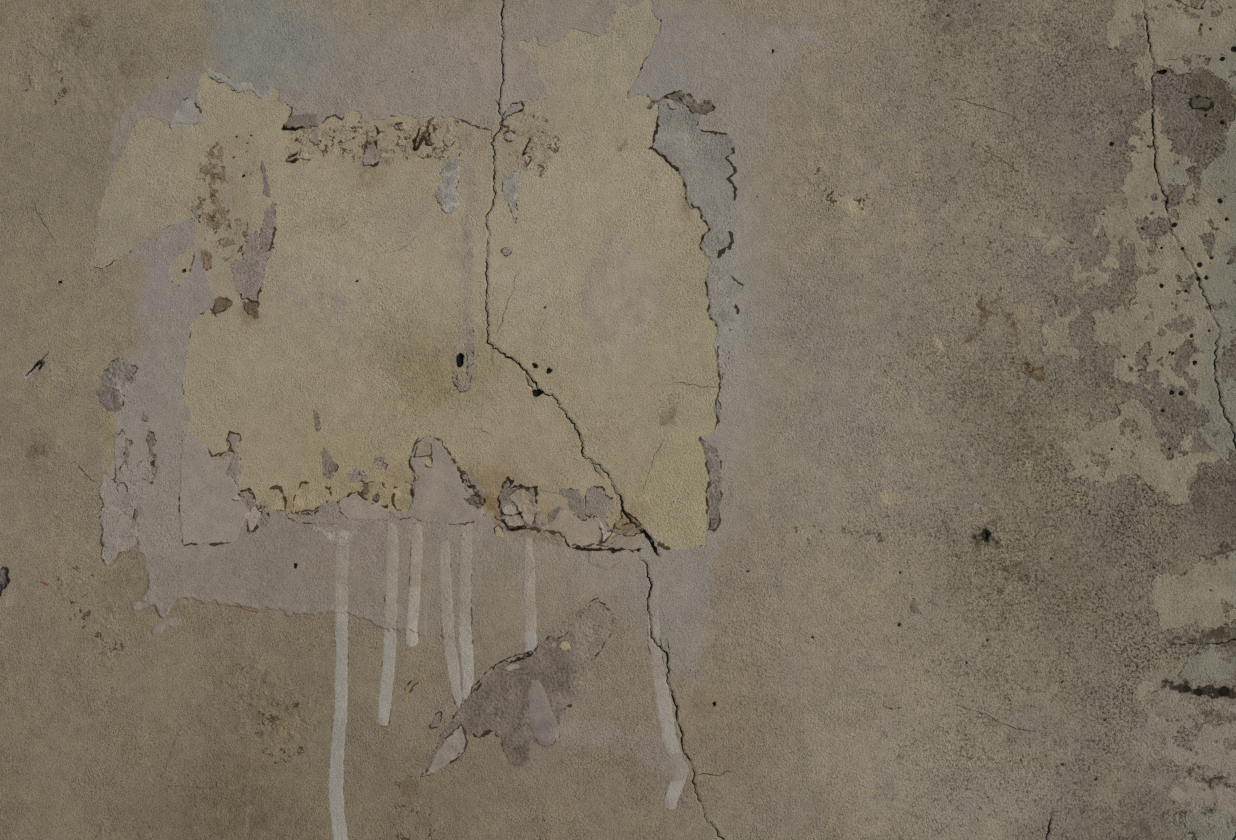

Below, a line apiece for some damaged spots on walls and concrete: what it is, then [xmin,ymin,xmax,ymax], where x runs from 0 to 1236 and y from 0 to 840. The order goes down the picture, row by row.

peeling [58,400,158,658]
peeling [90,0,744,550]
peeling [420,597,617,778]
crack [470,0,731,840]
peeling [1001,0,1236,537]
peeling [1130,549,1236,840]
crack [1142,1,1236,447]